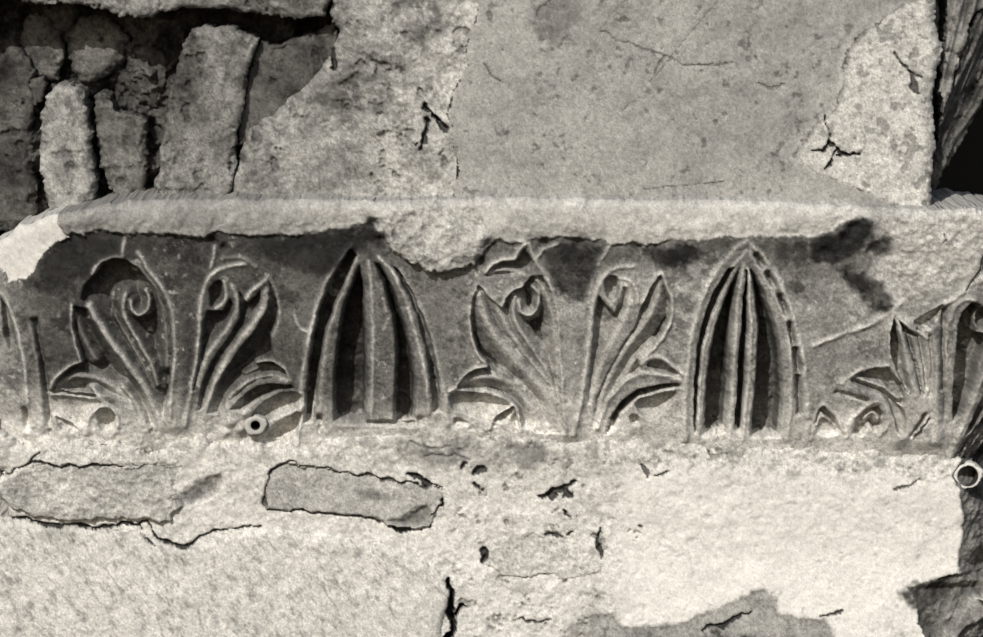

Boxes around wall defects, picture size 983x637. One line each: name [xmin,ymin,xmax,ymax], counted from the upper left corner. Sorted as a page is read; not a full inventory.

crack [893,52,923,95]
peeling [230,0,492,272]
crack [812,115,862,171]
flaking render [792,0,983,319]
spalling [0,206,71,283]
crack [444,577,468,637]